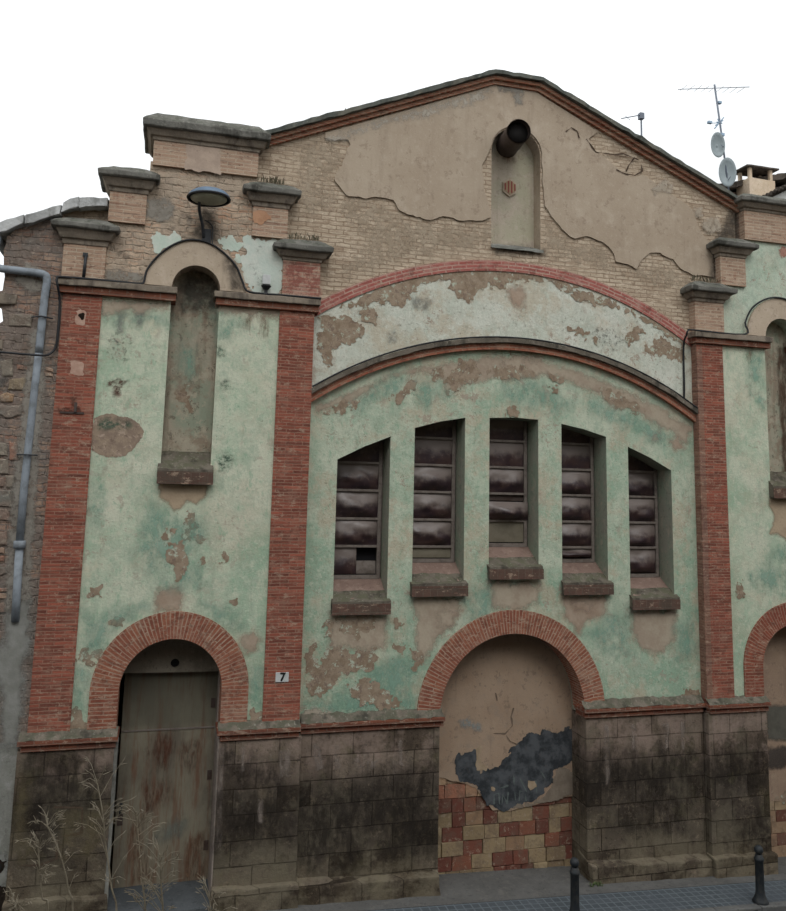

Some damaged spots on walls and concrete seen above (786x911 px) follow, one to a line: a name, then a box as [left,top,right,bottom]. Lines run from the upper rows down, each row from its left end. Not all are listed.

flaking render [91,413,144,458]
flaking render [155,484,207,612]
flaking render [315,271,713,698]
flaking render [769,498,786,538]
flaking render [304,597,461,711]
spalling [513,767,573,808]